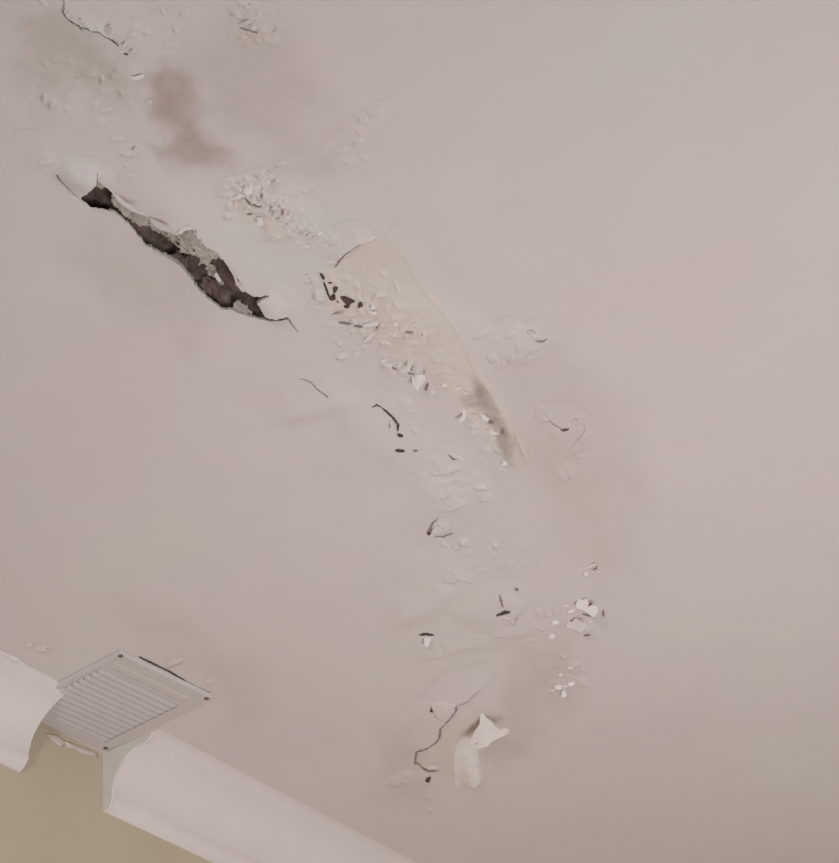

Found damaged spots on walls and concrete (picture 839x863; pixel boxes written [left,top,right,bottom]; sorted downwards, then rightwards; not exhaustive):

crack [259,313,298,332]
peeling [214,159,541,478]
peeling [547,598,605,639]
peeling [384,663,509,815]